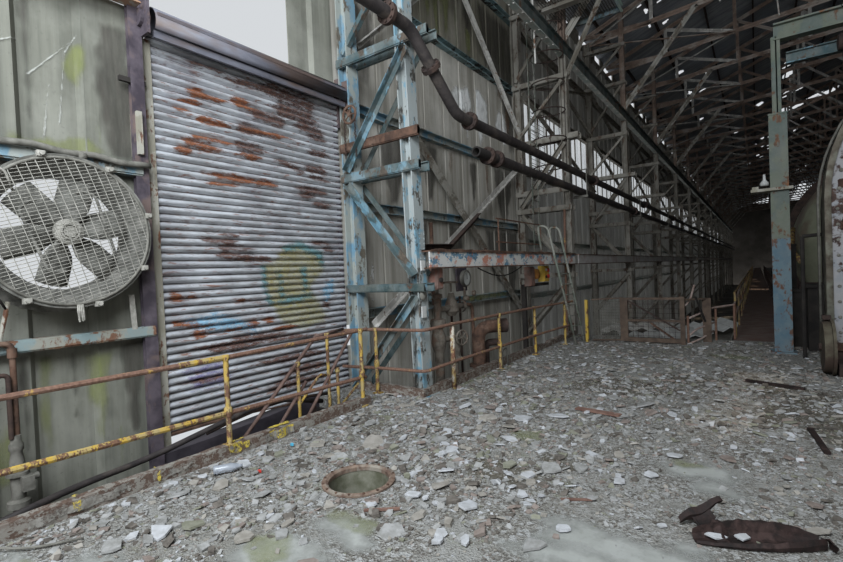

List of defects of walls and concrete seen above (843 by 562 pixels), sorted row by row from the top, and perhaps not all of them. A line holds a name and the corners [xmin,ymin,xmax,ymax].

rust [172,60,330,209]